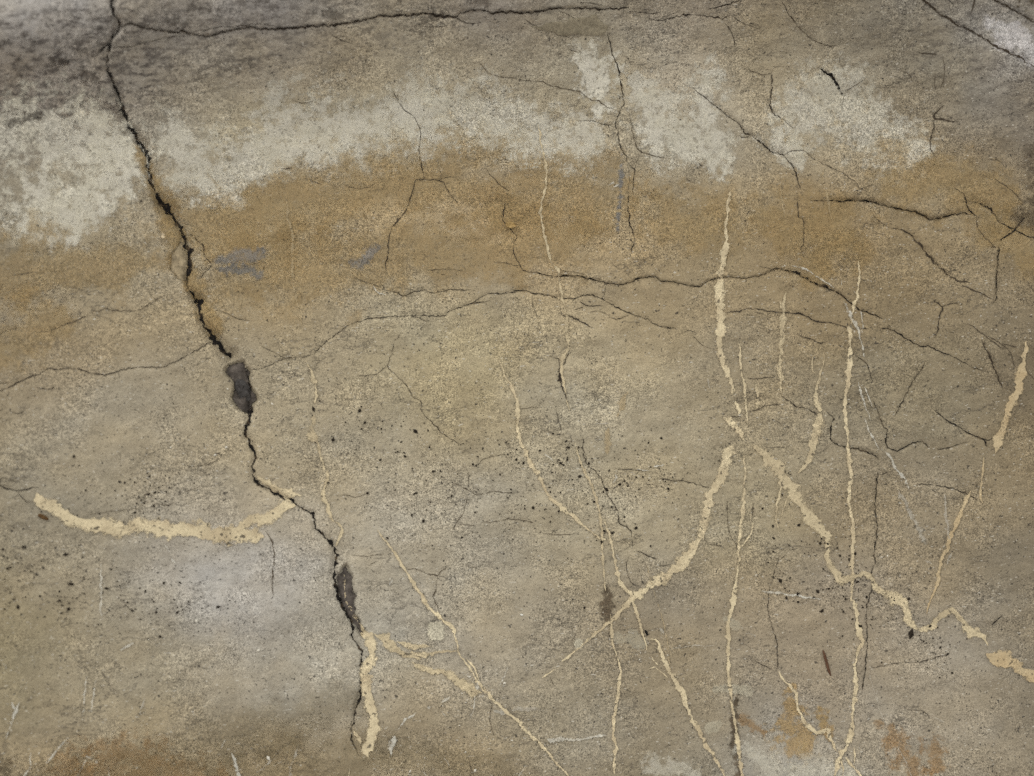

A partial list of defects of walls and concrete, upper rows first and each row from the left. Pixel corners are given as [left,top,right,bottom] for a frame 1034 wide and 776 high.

crack [784,3,836,47]
crack [923,0,1034,67]
leakage [987,20,1034,65]
leakage [0,39,744,264]
crack [745,68,793,128]
leakage [768,63,935,170]
crack [903,53,955,156]
crack [0,0,759,414]
leakage [184,265,222,335]
crack [88,88,1034,754]
crack [0,477,40,502]